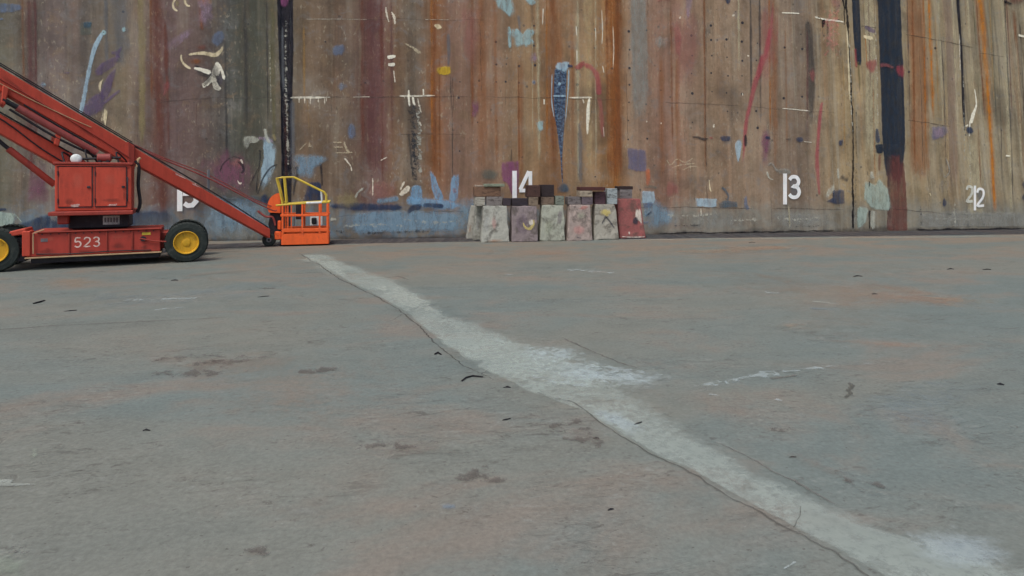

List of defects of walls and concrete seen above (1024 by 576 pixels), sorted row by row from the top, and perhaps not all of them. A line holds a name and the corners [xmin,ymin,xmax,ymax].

corrosion [606,0,621,173]
corrosion [982,71,995,204]